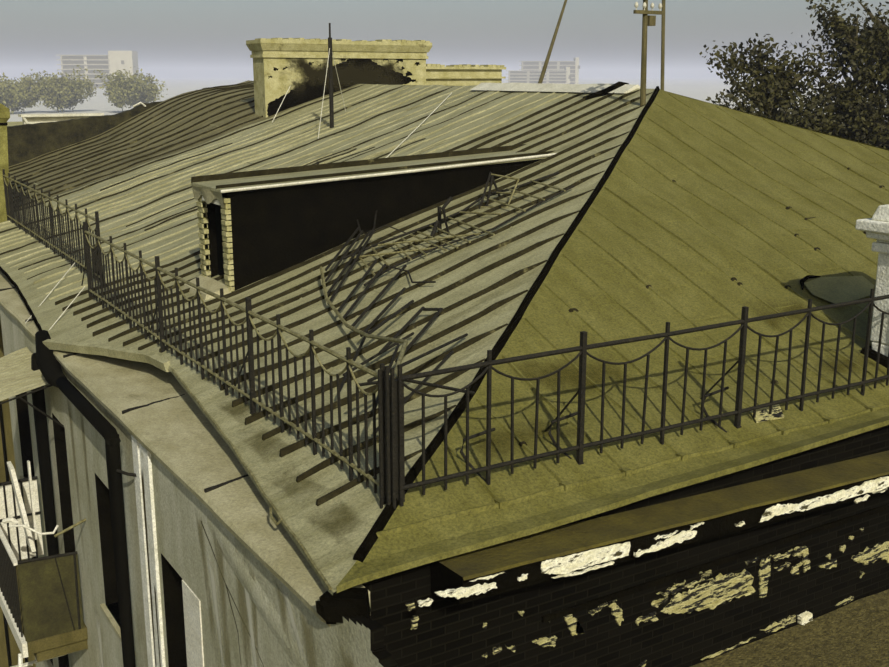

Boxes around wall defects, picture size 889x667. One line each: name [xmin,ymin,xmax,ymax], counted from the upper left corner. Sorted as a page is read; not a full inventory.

peeling [760,476,889,522]
peeling [541,522,704,579]
peeling [636,528,889,626]
peeling [406,572,505,630]
peeling [482,645,516,658]
peeling [532,636,557,647]
peeling [564,614,585,636]
peeling [588,599,624,626]
peeling [701,611,813,660]